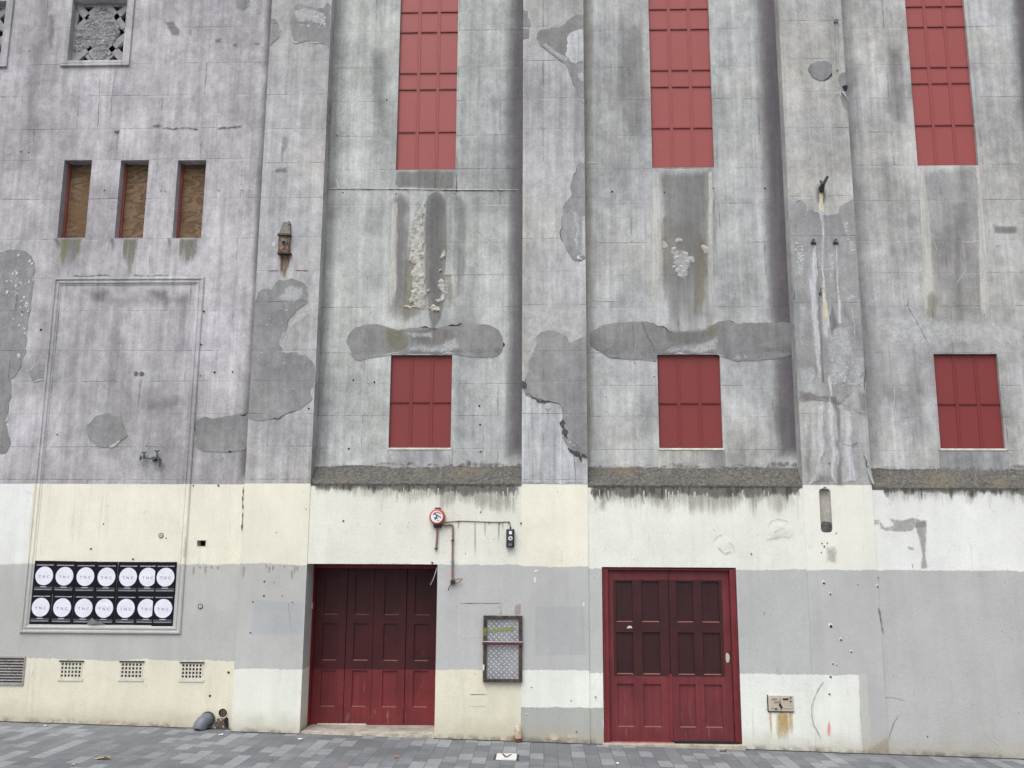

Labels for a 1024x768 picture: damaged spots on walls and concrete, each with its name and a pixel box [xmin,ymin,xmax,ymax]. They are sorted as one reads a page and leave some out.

flaking render [536,15,584,104]
damp [389,170,453,344]
flaking render [560,163,585,261]
damp [652,172,713,305]
flaking render [0,250,35,454]
flaking render [249,279,315,421]
flaking render [520,330,588,484]
damp [800,193,855,484]
damp [316,484,518,502]
damp [886,488,1024,506]
rust [770,712,792,732]